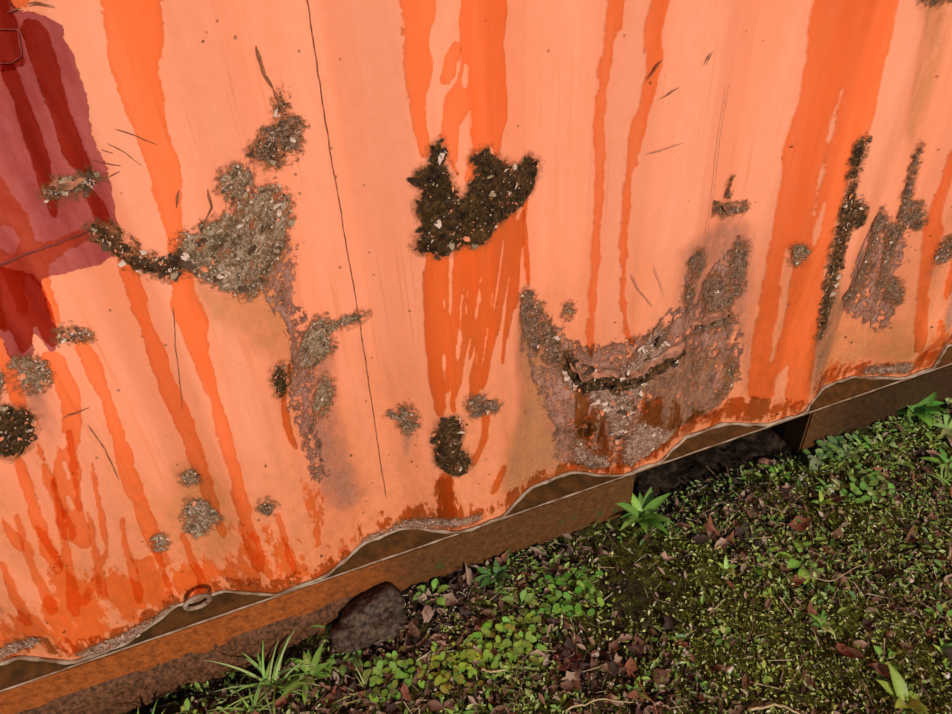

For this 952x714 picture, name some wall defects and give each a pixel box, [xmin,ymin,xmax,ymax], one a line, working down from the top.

peeling [37,165,108,203]
peeling [80,217,199,284]
corrosion [815,135,930,343]
peeling [844,229,908,332]
corrosion [0,354,53,460]
peeling [50,323,94,348]
peeling [263,235,330,484]
corrosion [271,309,372,419]
corrosion [386,403,421,437]
corrosion [463,393,503,419]
peeling [520,268,744,473]
corrosion [178,498,223,540]